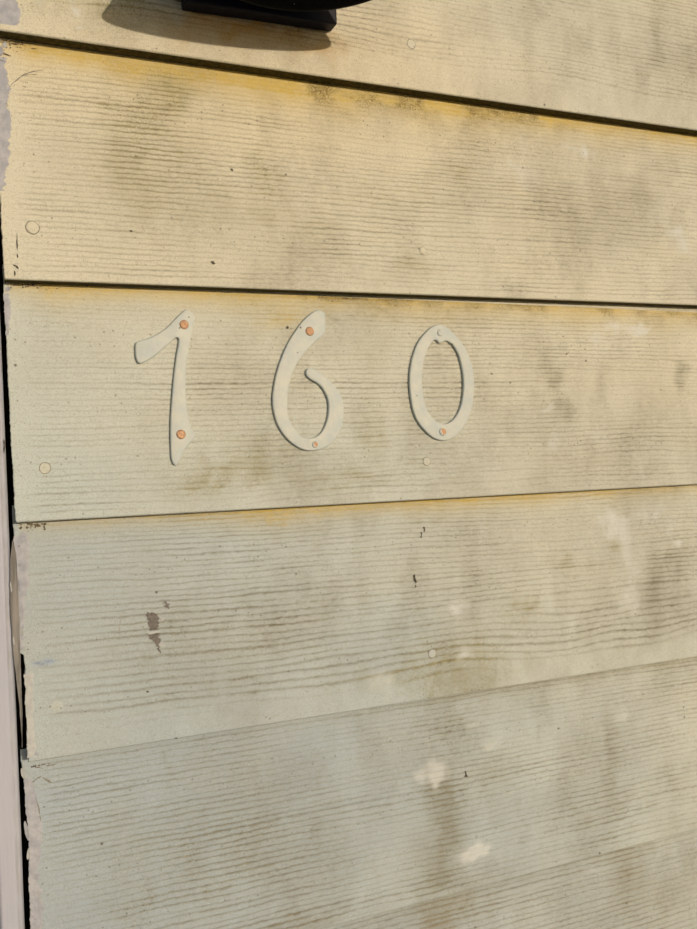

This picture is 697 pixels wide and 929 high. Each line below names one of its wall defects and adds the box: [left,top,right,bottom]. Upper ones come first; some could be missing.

leakage [0,0,697,530]
peeling [146,598,170,654]